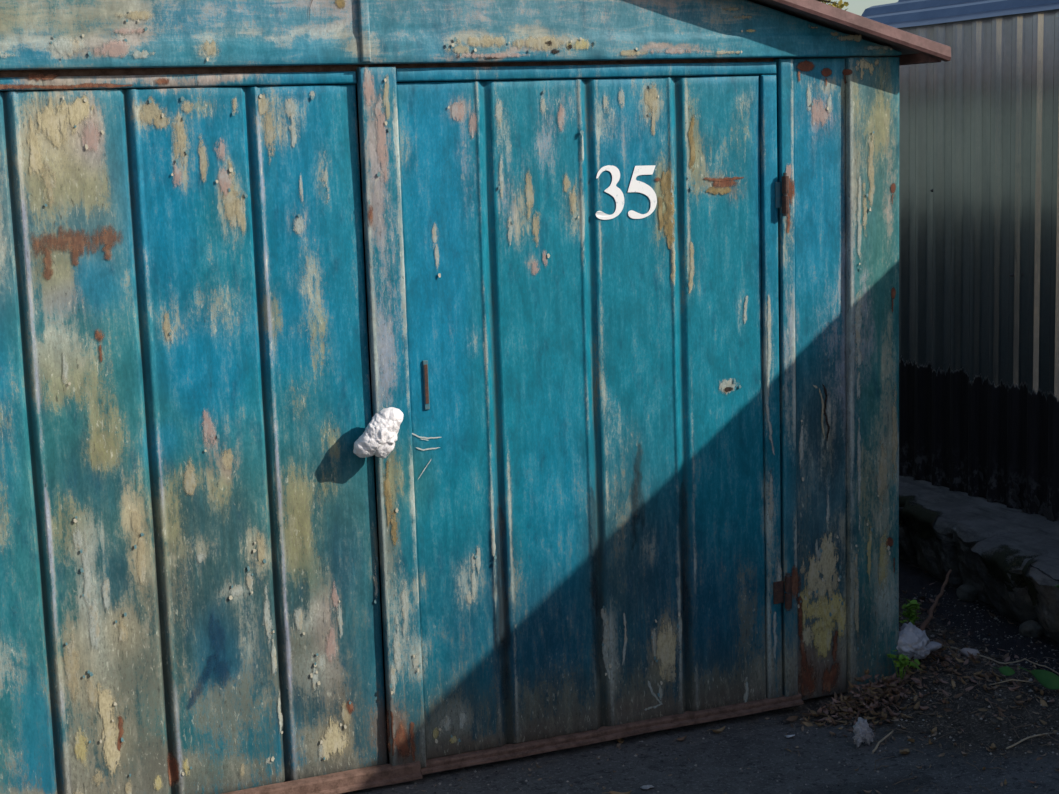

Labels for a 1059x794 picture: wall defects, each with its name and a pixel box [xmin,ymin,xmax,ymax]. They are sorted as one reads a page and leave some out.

peeling [446,36,597,59]
corrosion [797,60,852,87]
peeling [645,84,659,135]
peeling [27,96,104,207]
corrosion [704,177,744,195]
corrosion [782,165,795,233]
corrosion [32,226,120,280]
crack [813,385,830,440]
peeling [797,419,891,658]
peeling [73,516,128,649]
corrosion [790,565,840,700]
peeling [64,641,124,785]